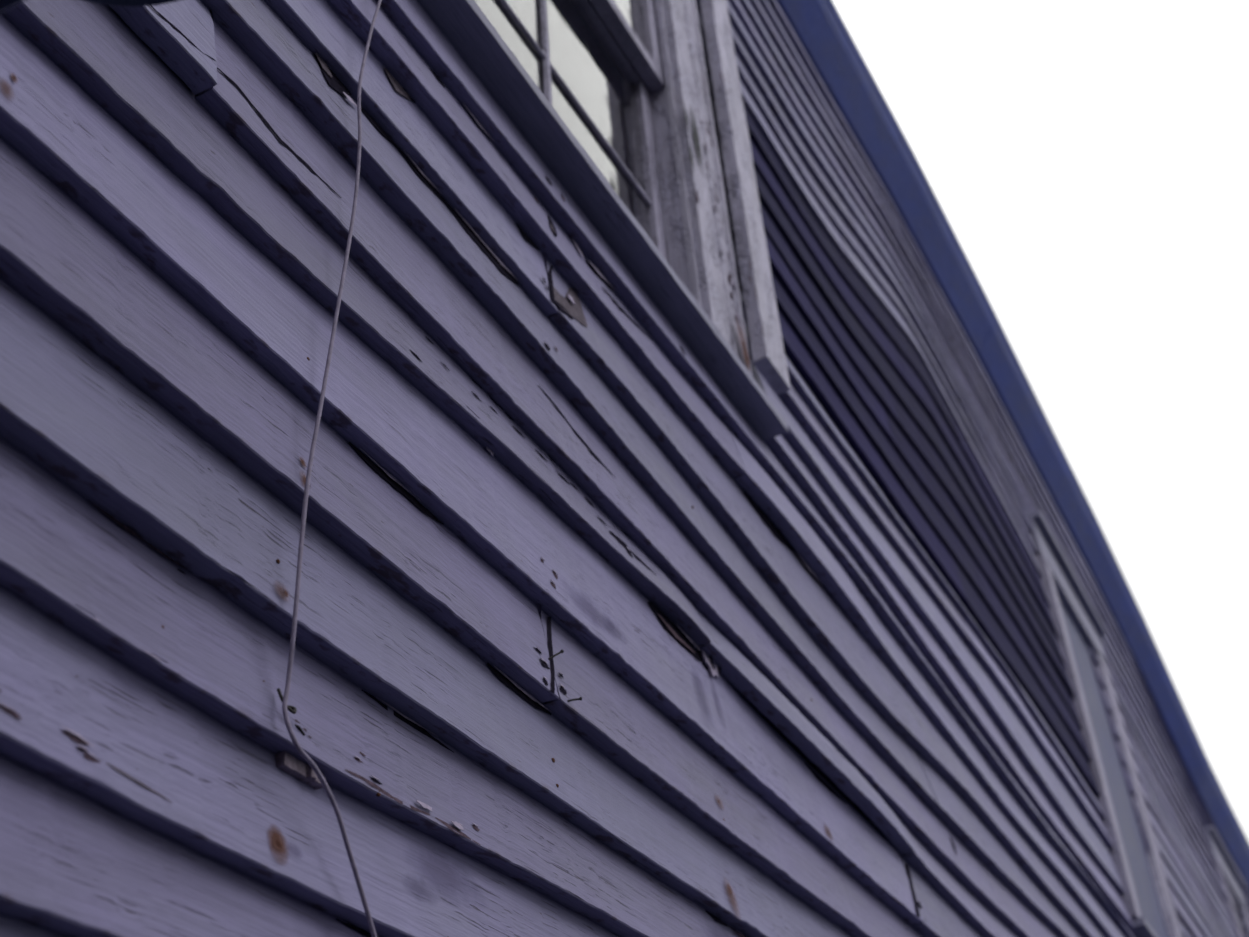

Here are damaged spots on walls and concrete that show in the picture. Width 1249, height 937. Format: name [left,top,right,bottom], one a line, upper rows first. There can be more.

crack [151,6,341,198]
spalling [553,286,587,327]
crack [610,531,709,671]
peeling [0,688,22,720]
crack [487,617,582,715]
corrosion [270,829,286,859]
peeling [345,752,480,845]